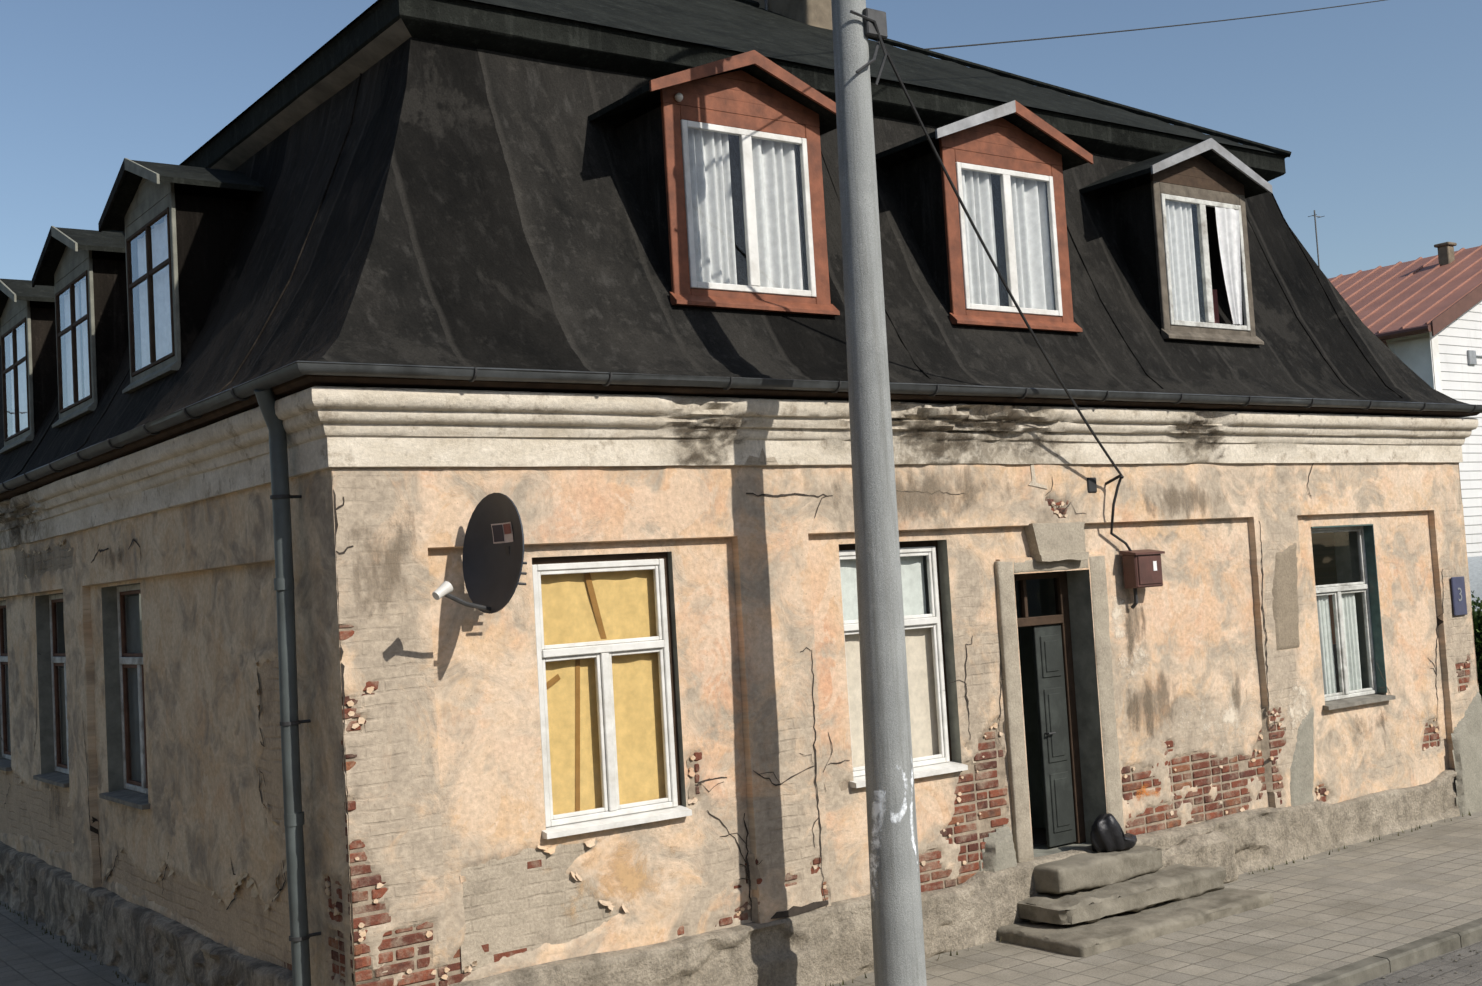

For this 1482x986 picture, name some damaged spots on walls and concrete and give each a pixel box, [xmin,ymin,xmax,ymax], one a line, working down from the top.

water stain [677,414,746,465]
water stain [891,405,1058,457]
water stain [896,478,941,514]
flaking render [339,624,354,645]
flaking render [1455,655,1470,693]
flaking render [1422,718,1440,751]
crack [697,647,850,921]
flaking render [919,718,1009,892]
flaking render [1121,707,1286,835]
peeling [325,681,629,986]
flaking render [715,854,829,927]